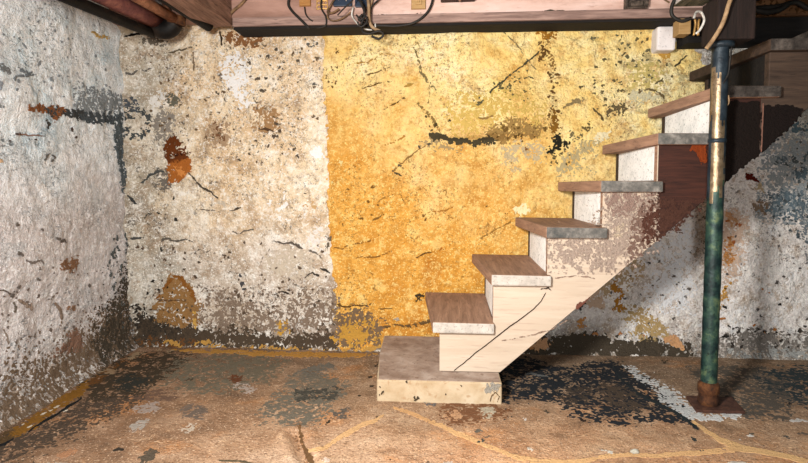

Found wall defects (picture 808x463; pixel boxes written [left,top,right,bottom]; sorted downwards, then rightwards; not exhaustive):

crack [489,32,539,94]
crack [356,34,497,176]
spalling [604,102,628,118]
rust [163,133,192,185]
peeling [556,140,600,177]
crack [188,172,241,211]
crack [261,240,390,278]
spalling [585,291,606,310]
water stain [0,233,352,463]
spalling [529,337,554,352]
spalling [663,334,685,351]
crack [298,424,314,463]